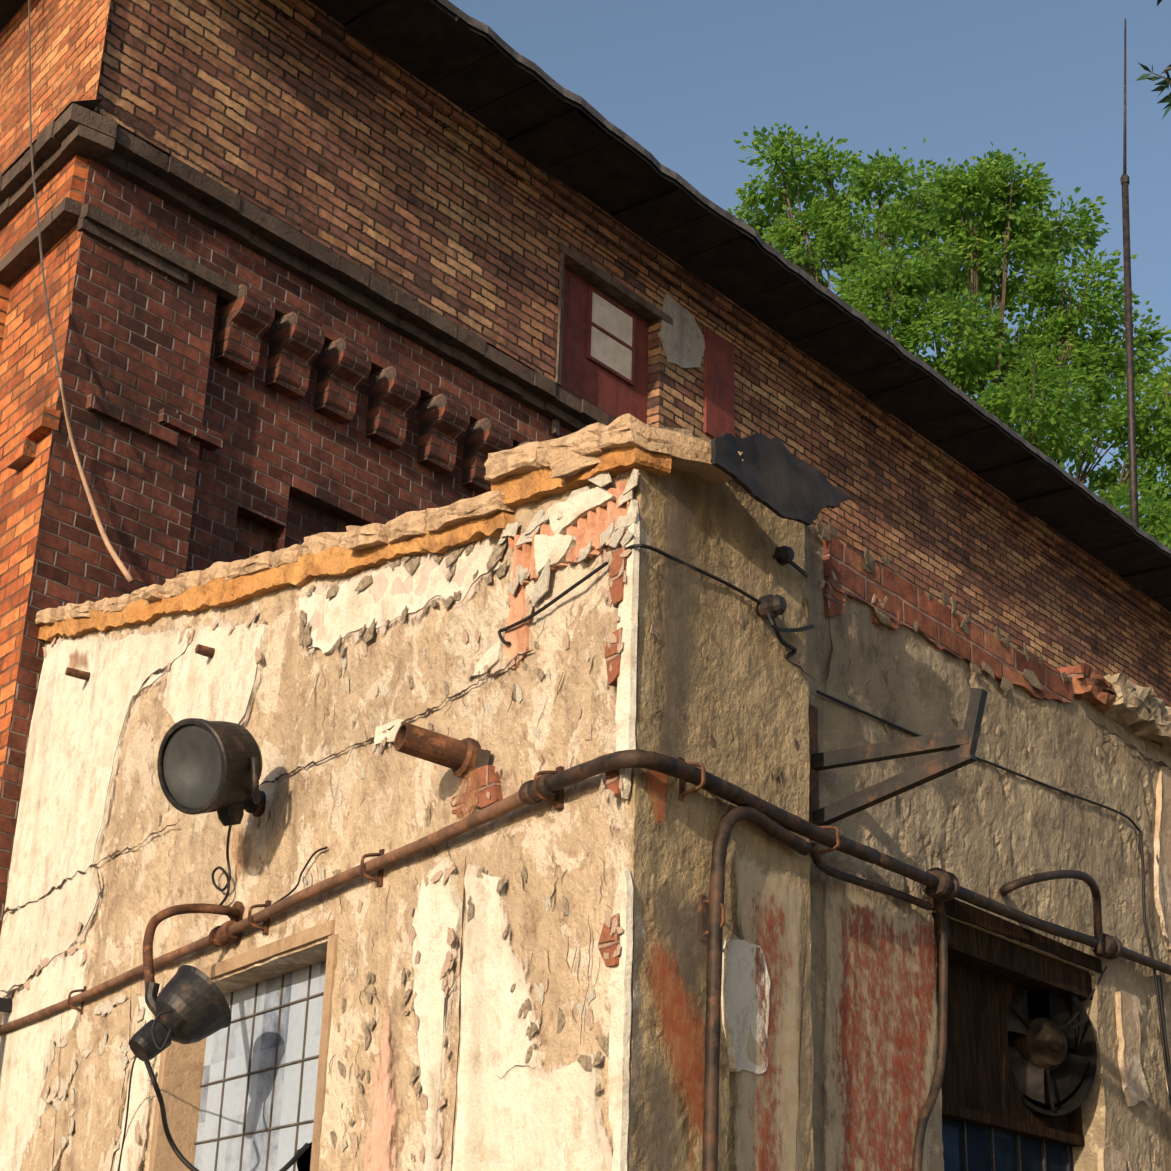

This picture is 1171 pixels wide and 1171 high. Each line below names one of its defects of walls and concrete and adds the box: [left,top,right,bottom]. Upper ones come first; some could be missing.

peeling [299,469,639,740]
flaking render [816,517,1075,703]
crack [1,639,194,933]
peeling [0,609,270,1171]
peeling [290,865,363,921]
peeling [352,717,404,753]
peeling [325,841,623,1171]
rust [646,935,705,1168]
peeling [721,855,802,1171]
peeling [1115,991,1171,1108]
peeling [1153,767,1171,952]